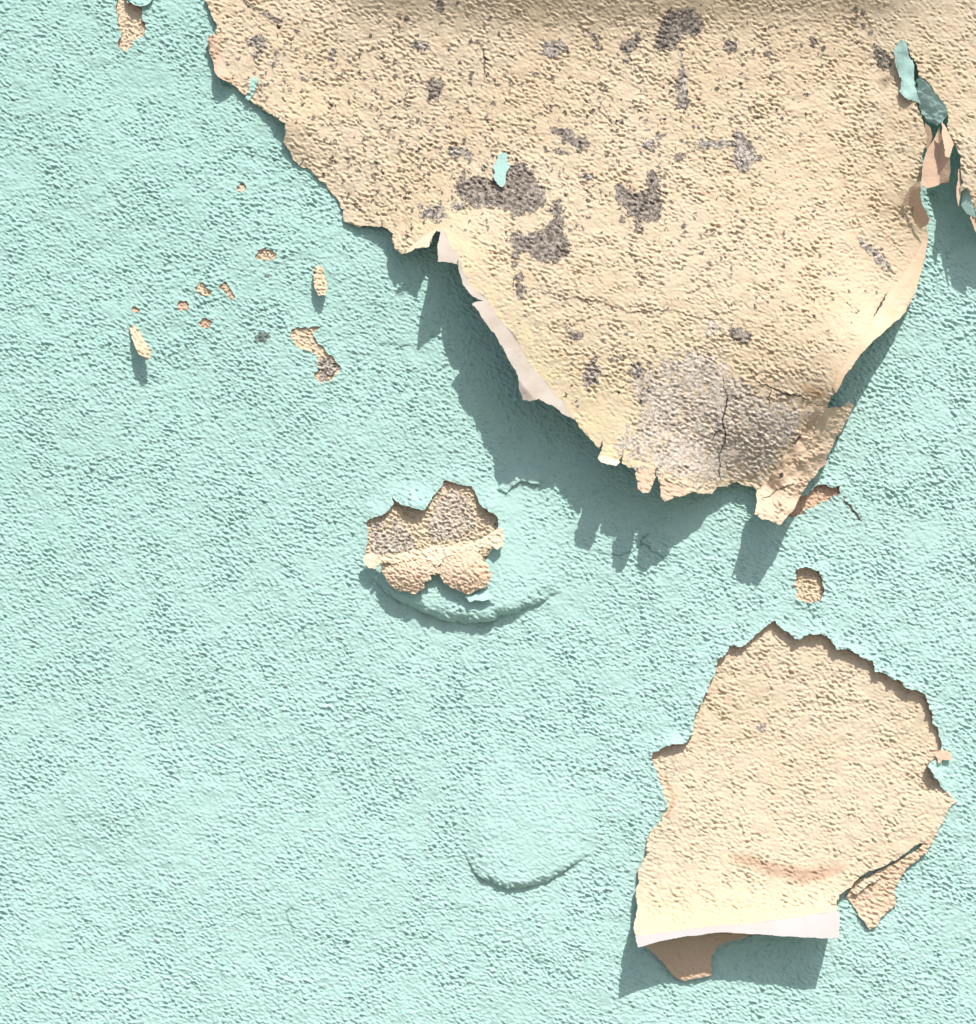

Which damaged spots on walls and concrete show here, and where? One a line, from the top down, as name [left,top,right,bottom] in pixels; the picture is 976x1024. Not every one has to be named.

peeling [116,0,152,51]
peeling [129,306,151,360]
peeling [195,282,235,300]
peeling [205,0,976,525]
crack [713,372,824,483]
peeling [363,480,505,602]
peeling [794,567,824,603]
peeling [633,621,955,981]